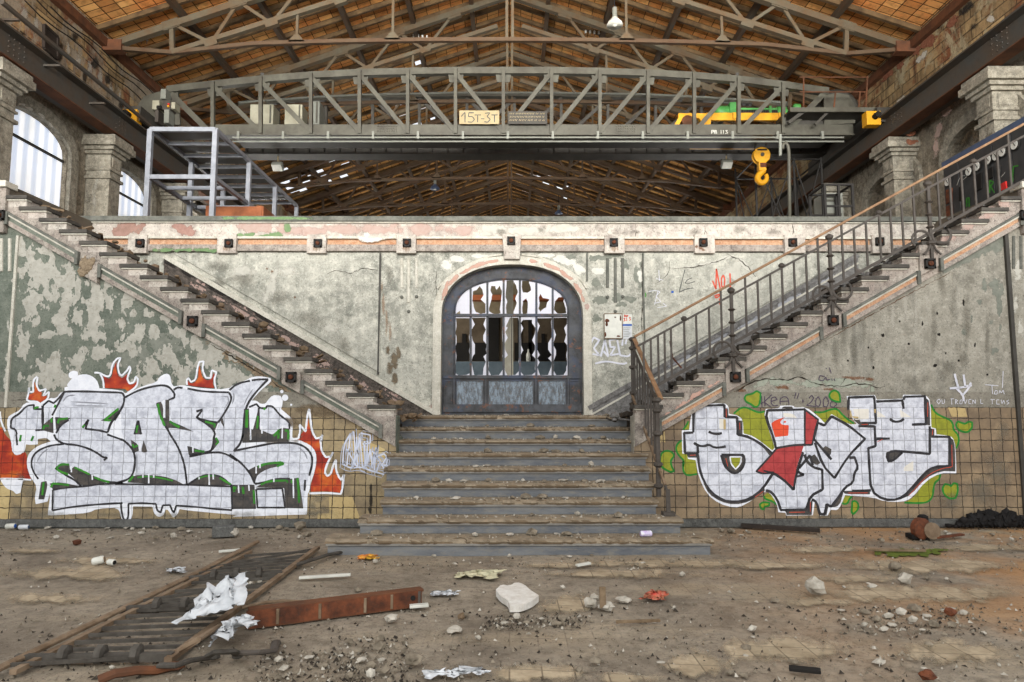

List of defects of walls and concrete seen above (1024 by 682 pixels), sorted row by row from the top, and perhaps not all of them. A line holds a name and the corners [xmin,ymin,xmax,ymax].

peeling [112,223,146,236]
peeling [441,254,498,300]
peeling [3,236,299,392]
damp [386,347,401,384]
crack [734,373,885,392]